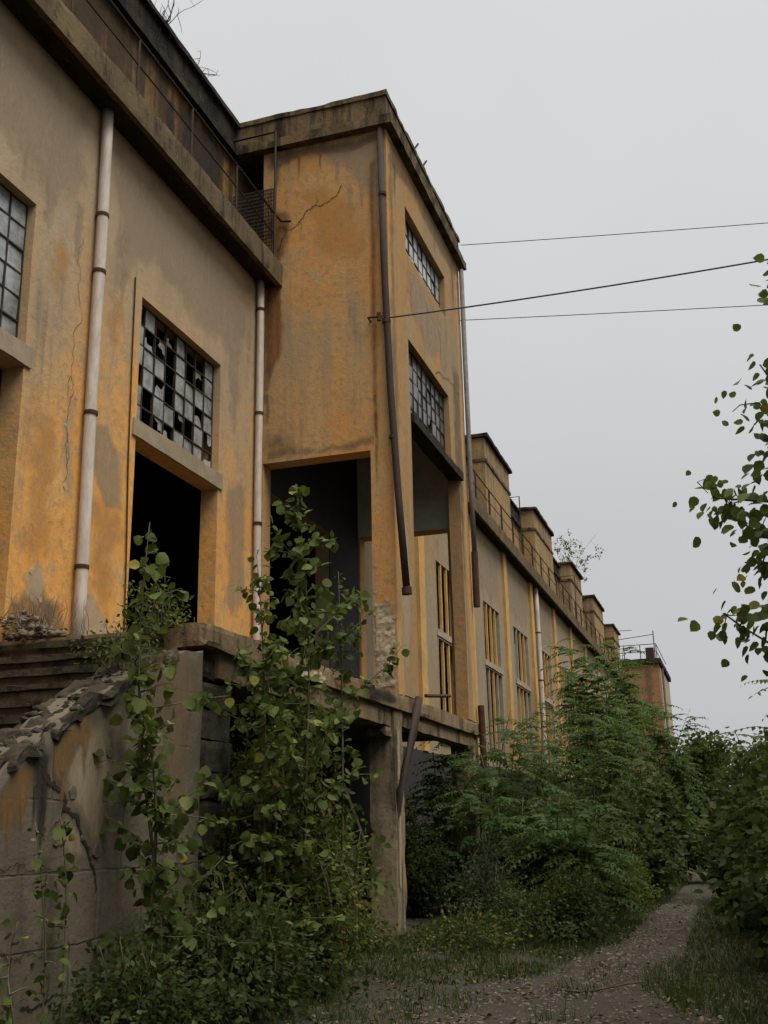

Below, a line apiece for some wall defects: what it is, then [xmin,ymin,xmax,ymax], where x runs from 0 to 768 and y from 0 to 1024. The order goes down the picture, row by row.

crack [277,185,342,251]
spalling [373,520,411,687]
crack [30,743,97,891]
corrosion [54,719,90,801]